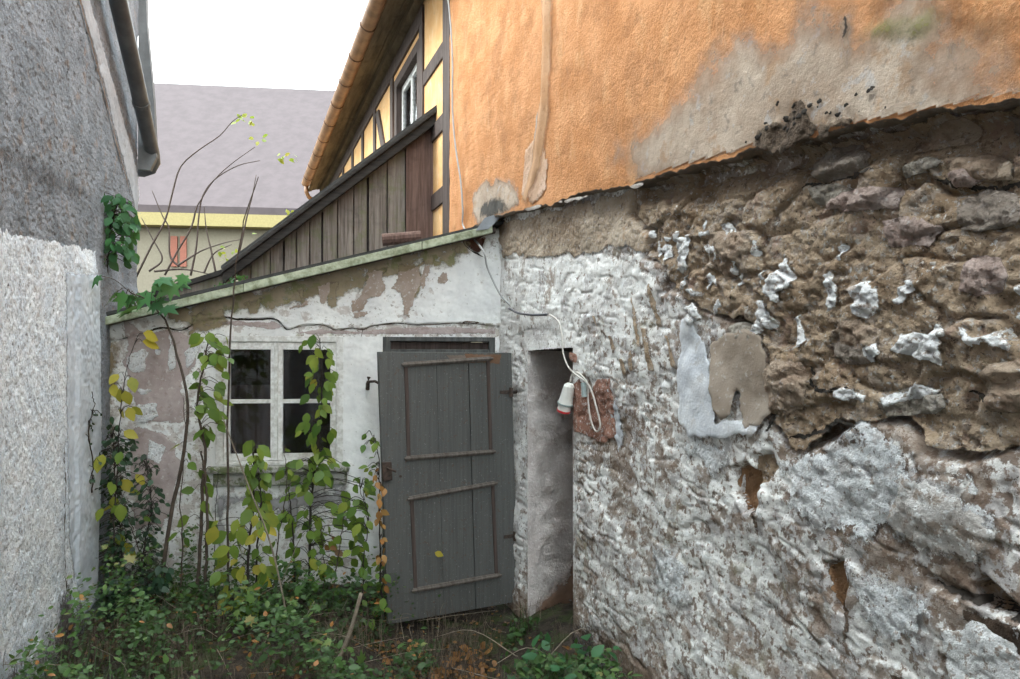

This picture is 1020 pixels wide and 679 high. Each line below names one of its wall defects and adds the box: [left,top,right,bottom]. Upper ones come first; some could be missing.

leakage [631,0,981,177]
spalling [296,265,495,335]
spalling [498,92,1020,452]
peeling [758,454,779,483]